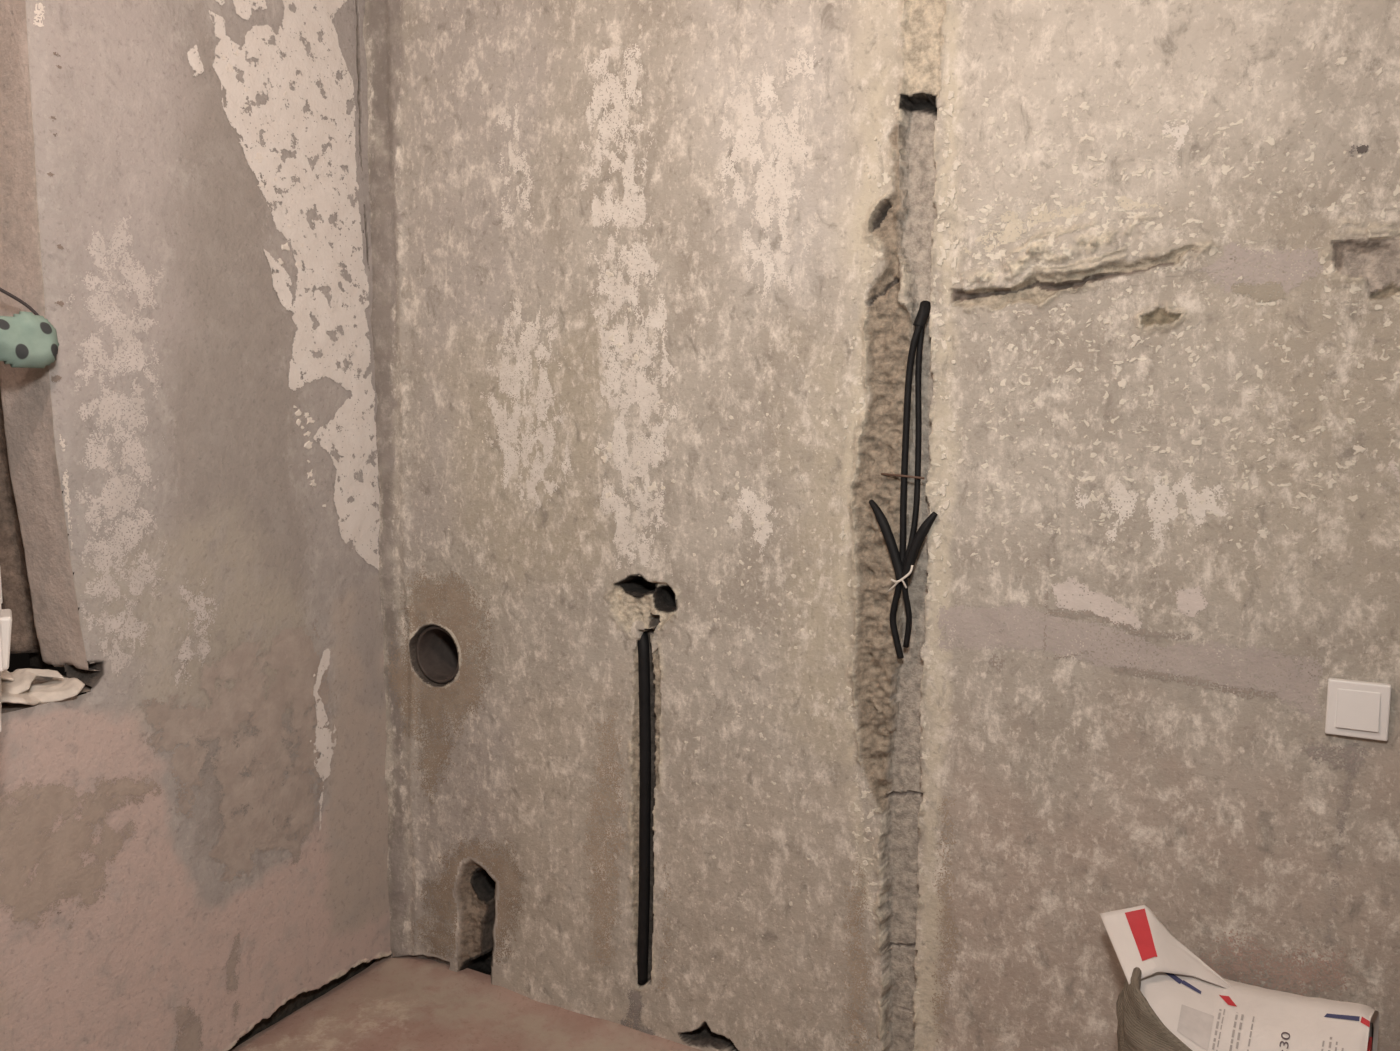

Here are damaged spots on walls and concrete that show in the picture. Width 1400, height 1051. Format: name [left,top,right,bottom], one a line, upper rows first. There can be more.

peeling [187,0,380,570]
spalling [936,86,1224,389]
peeling [701,471,792,583]
spalling [821,123,917,839]
peeling [1068,426,1231,568]
crack [220,950,392,1051]